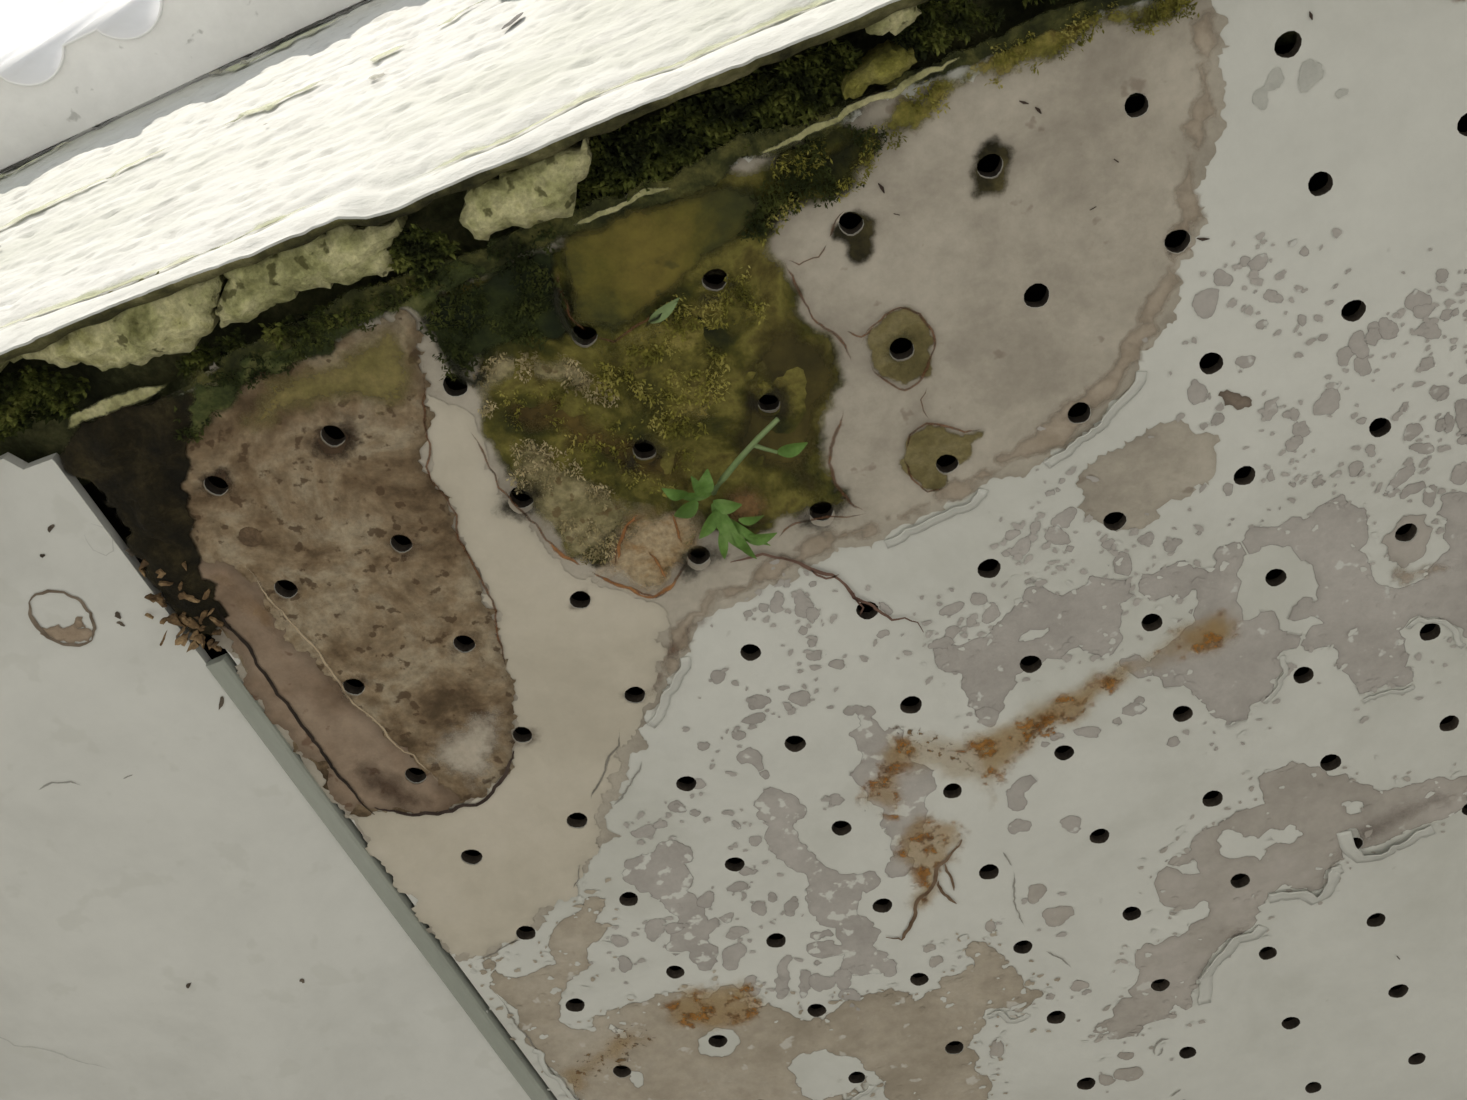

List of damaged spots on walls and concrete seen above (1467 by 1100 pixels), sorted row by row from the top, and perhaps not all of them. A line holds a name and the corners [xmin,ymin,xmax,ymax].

leakage [888,0,1160,92]
leakage [830,212,876,264]
peeling [1192,232,1328,358]
leakage [59,97,866,817]
peeling [275,0,1229,1100]
crack [731,553,924,632]
leakage [849,307,983,493]
peeling [913,269,1467,751]
corrosion [864,696,1085,819]
corrosion [899,820,949,902]
peeling [1077,761,1467,1093]
corrosion [666,985,760,1028]